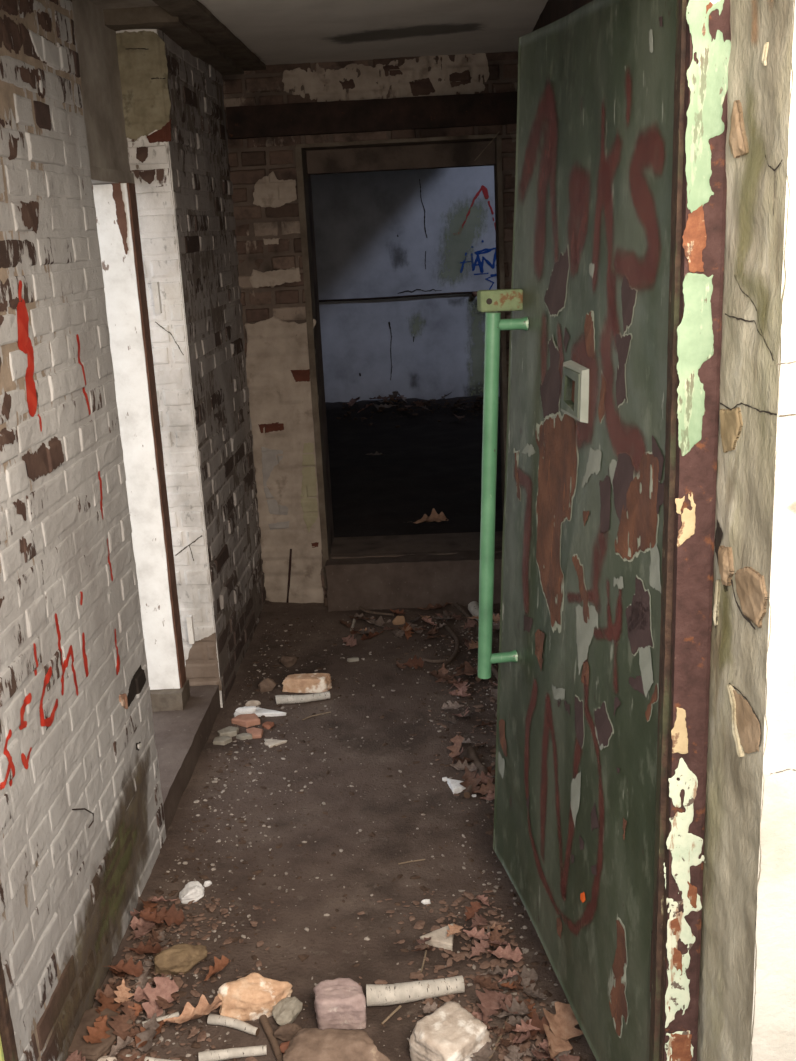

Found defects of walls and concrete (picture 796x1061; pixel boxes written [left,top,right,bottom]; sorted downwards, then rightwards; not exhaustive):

peeling [0,0,69,99]
flaking render [116,30,172,184]
flaking render [282,53,489,102]
peeling [17,201,39,234]
rust [682,205,707,273]
crack [725,275,796,365]
peeling [0,391,18,452]
crack [720,402,796,417]
peeling [22,436,64,480]
peeling [13,499,26,521]
flaking render [713,520,768,630]
flaking render [726,684,761,757]